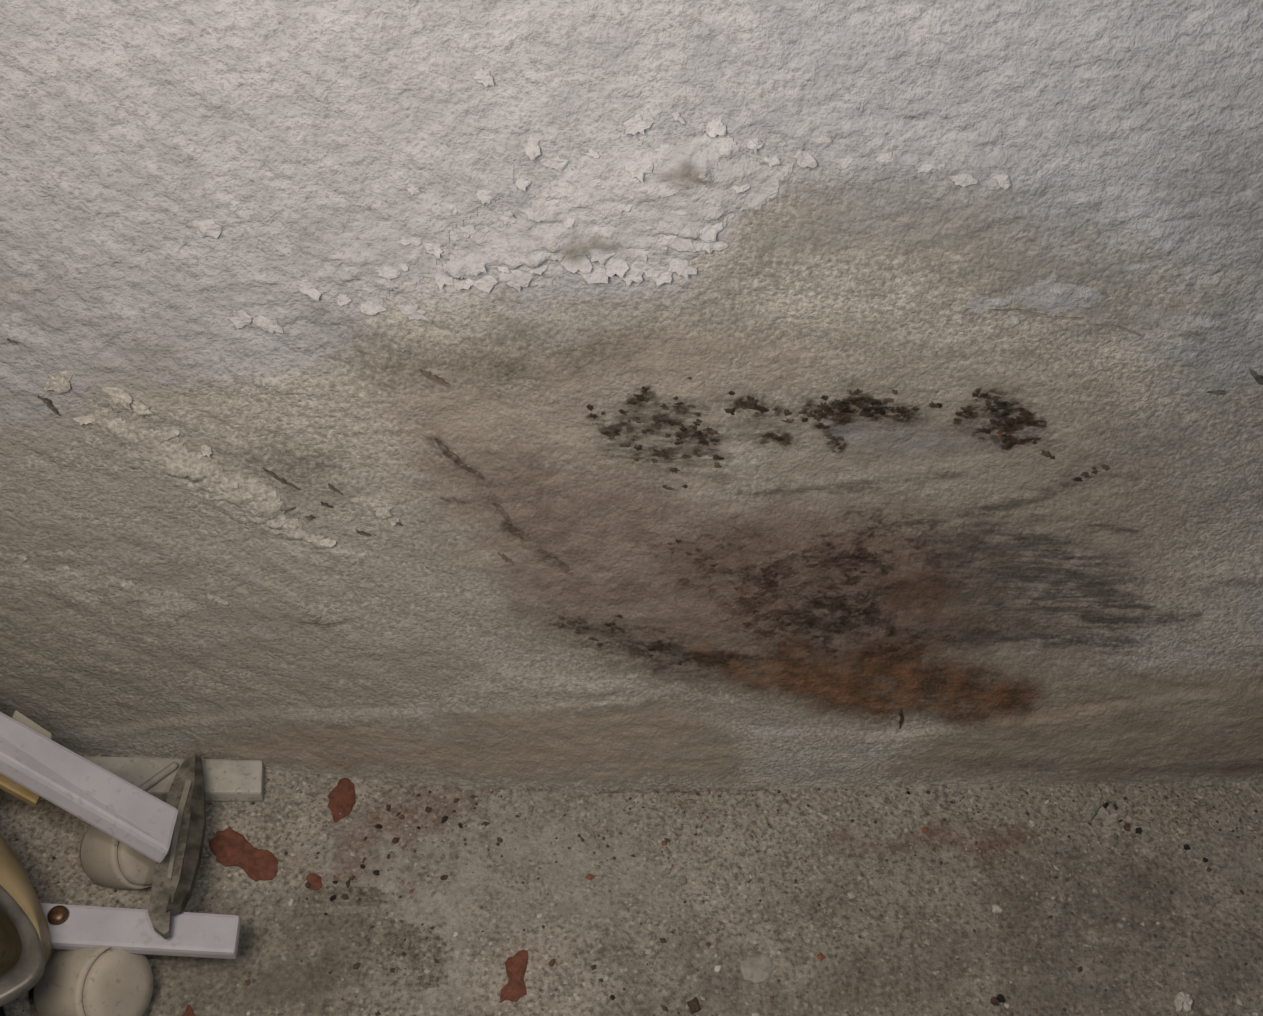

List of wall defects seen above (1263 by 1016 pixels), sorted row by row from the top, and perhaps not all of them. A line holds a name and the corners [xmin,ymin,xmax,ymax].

damp [408,332,1184,716]
rust [704,642,1141,732]